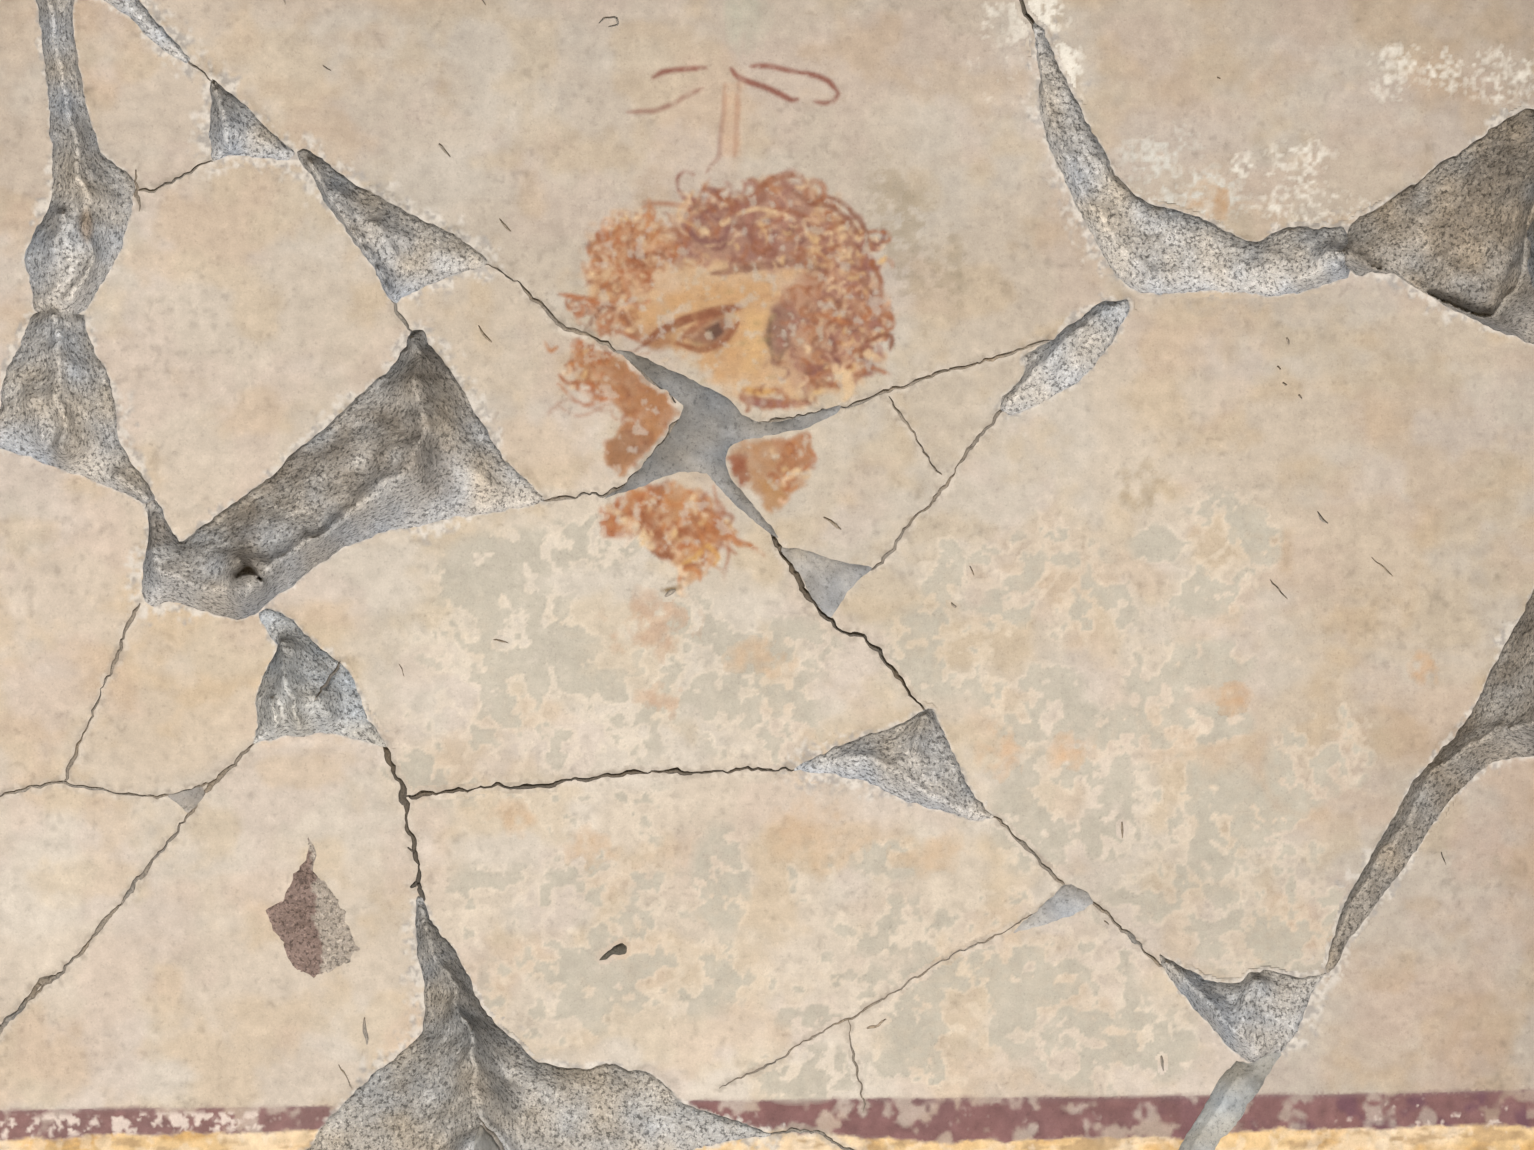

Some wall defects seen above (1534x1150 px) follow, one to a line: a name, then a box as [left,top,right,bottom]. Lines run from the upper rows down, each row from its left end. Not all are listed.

crack [1019,0,1036,39]
spalling [1000,23,1534,416]
peeling [0,0,993,821]
crack [486,264,679,502]
crack [759,340,1051,571]
crack [771,535,925,710]
crack [0,603,254,1034]
spalling [266,838,360,978]
spalling [307,896,771,1150]
crack [383,747,794,901]
crack [719,816,1163,1113]
peeling [738,589,1534,1106]